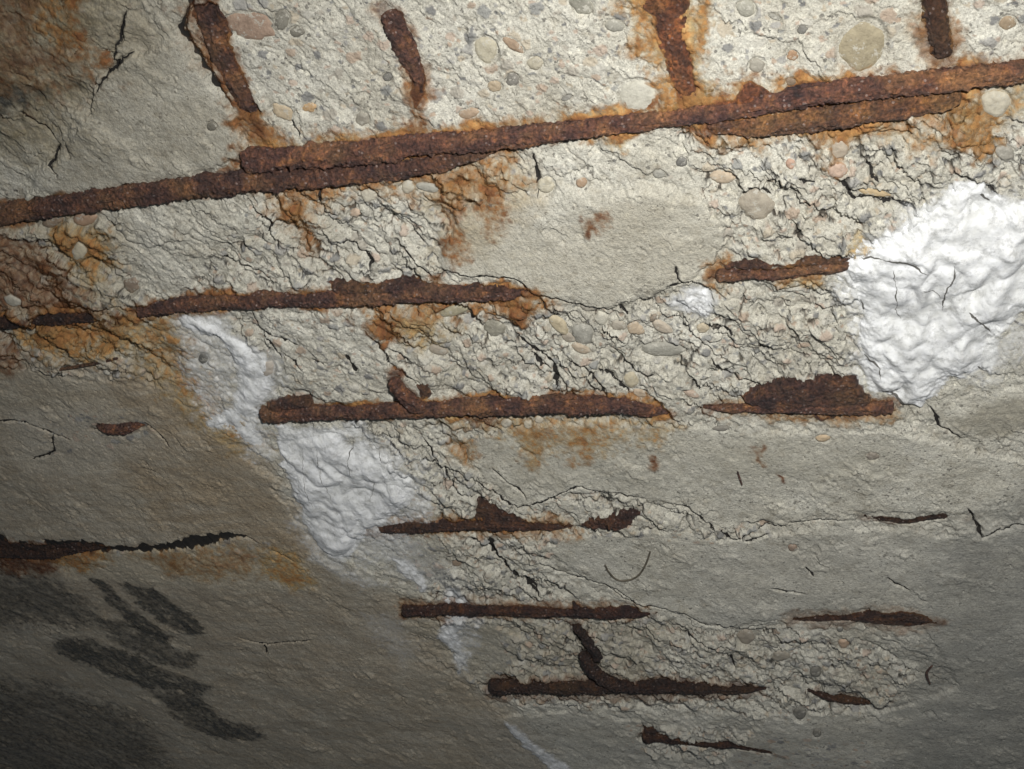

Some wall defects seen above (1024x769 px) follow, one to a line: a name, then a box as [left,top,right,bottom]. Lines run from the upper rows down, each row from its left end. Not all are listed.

spalling [203,0,679,146]
corrosion [0,0,1024,467]
crack [748,160,918,215]
spalling [673,90,1024,266]
efflorescence [832,180,1024,407]
crack [0,532,258,553]
efflorescence [177,313,431,562]
corrosion [366,496,641,539]
spalling [231,278,866,604]
crack [516,332,679,422]
damp [0,575,262,741]
corrosion [399,598,766,697]